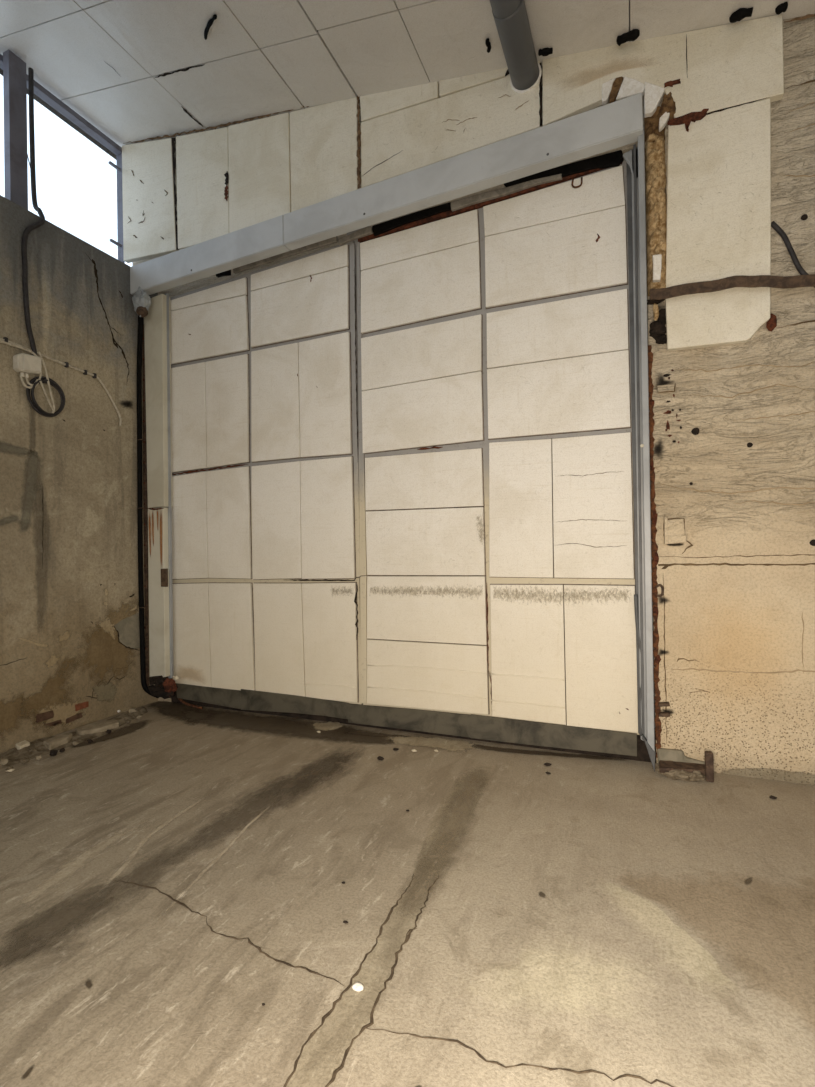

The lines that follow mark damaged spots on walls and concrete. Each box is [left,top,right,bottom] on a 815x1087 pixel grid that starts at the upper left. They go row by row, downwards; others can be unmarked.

crack [86,254,129,386]
leakage [0,407,48,623]
rust [148,508,164,564]
flaking render [99,601,140,651]
flaking render [36,682,120,729]
leakage [150,701,410,744]
leakage [471,743,622,760]
crack [114,874,674,1087]
leakage [596,863,815,1047]